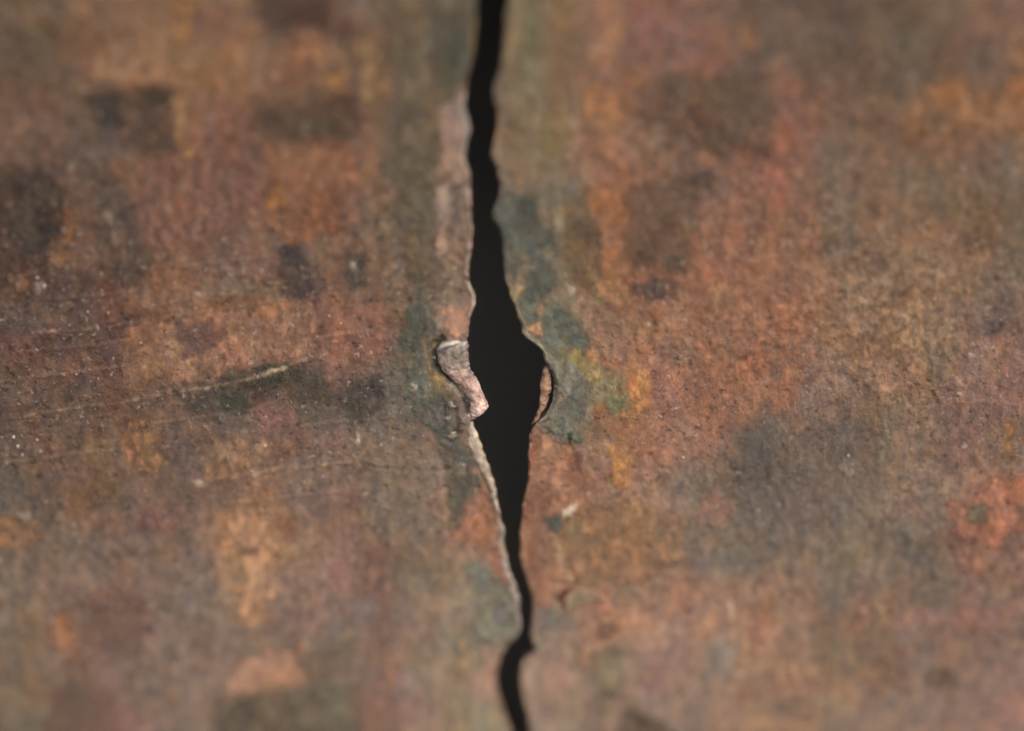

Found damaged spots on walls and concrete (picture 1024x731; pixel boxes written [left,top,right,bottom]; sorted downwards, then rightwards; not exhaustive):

rust [902,74,1024,141]
rust [265,143,348,244]
rust [587,181,632,313]
rust [434,307,470,338]
crack [459,0,555,731]
rust [621,368,651,433]
rust [690,260,813,428]
rust [831,244,972,472]
rust [73,418,162,509]
rust [519,423,632,609]
rust [948,477,1024,590]